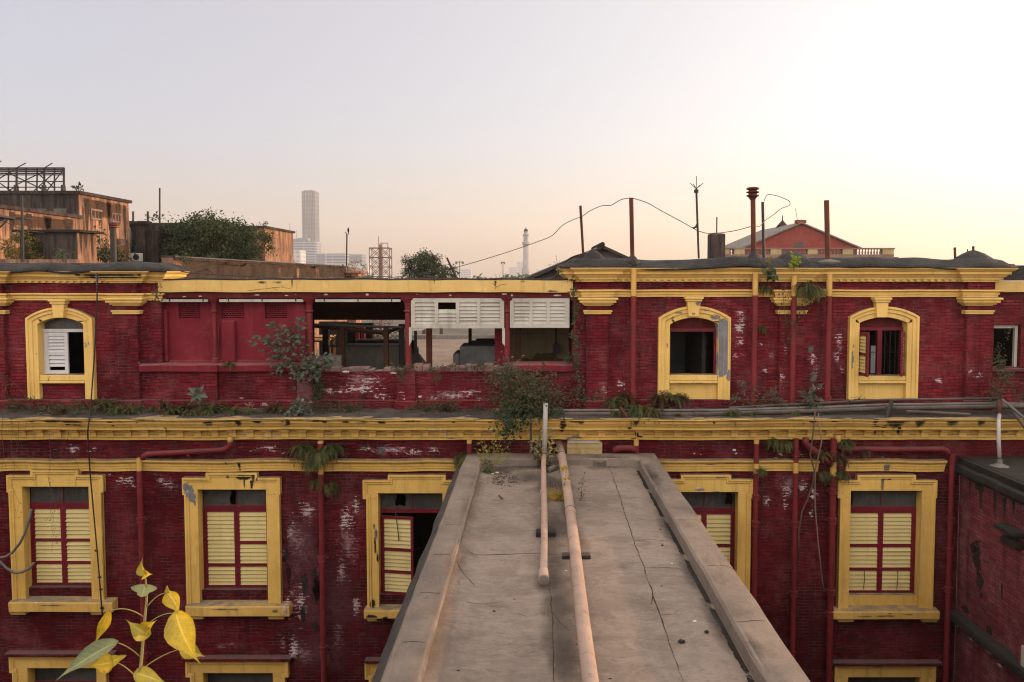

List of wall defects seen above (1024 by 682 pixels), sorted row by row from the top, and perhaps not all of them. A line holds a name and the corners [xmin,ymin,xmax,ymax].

peeling [672,301,730,381]
peeling [183,483,196,506]
crack [609,467,684,680]
leakage [971,540,984,598]